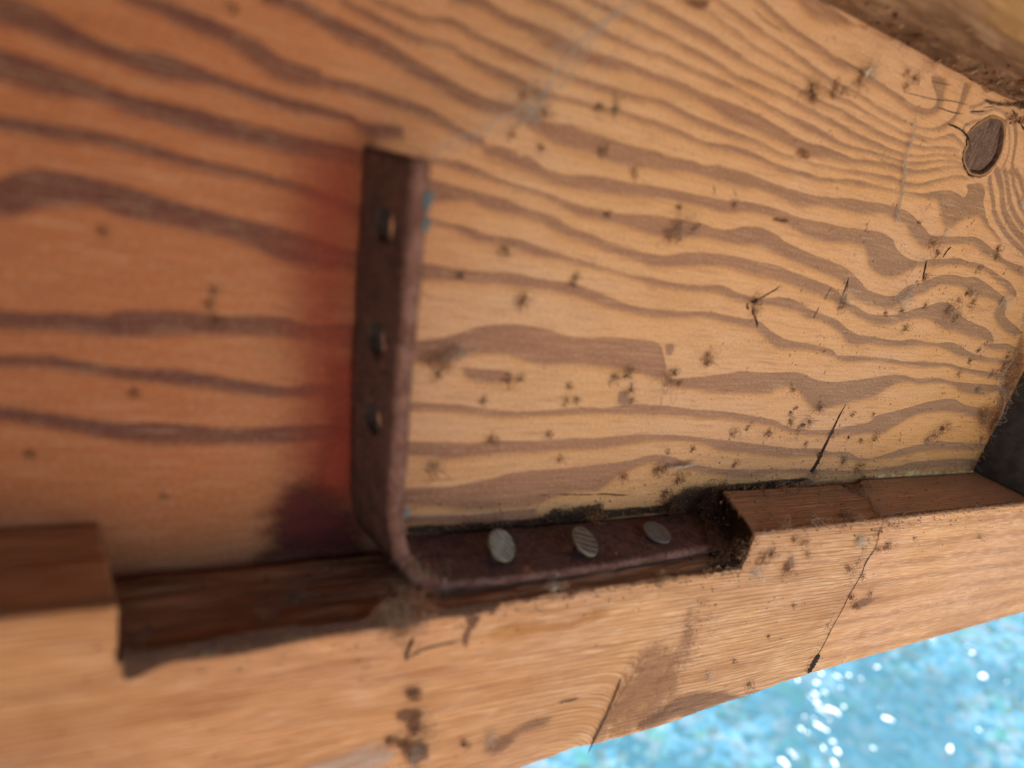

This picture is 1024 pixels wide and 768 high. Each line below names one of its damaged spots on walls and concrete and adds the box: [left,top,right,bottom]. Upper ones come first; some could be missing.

crack [810,405,846,473]
damp [259,487,364,560]
crack [805,537,879,675]